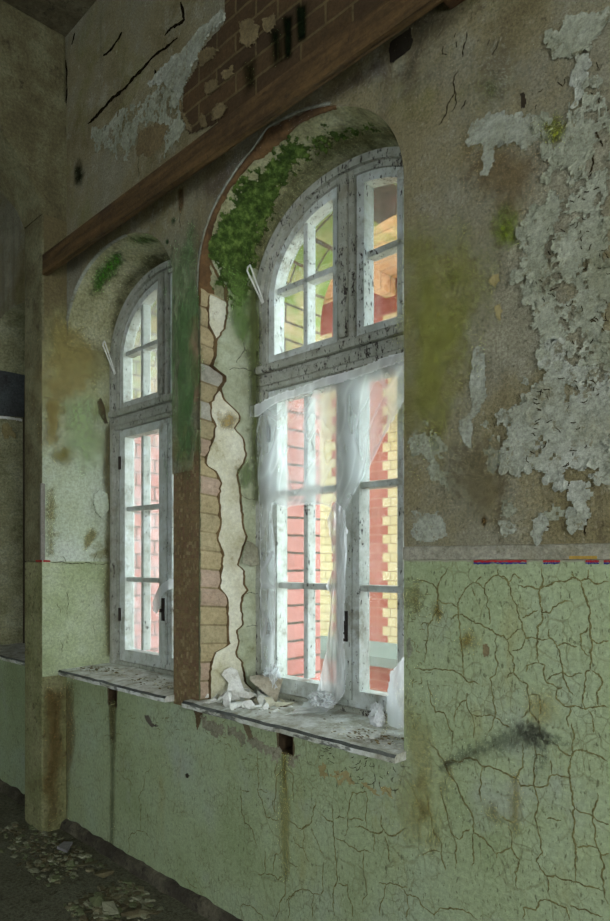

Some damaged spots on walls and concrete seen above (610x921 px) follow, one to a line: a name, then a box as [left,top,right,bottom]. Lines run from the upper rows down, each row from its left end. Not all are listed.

crack [65,33,75,103]
crack [88,2,185,124]
flaking render [91,0,380,161]
peeling [458,6,610,546]
flaking render [174,101,337,706]
peeling [407,420,450,491]
peeling [411,510,448,542]
corrosion [47,688,73,805]
crack [205,567,609,920]